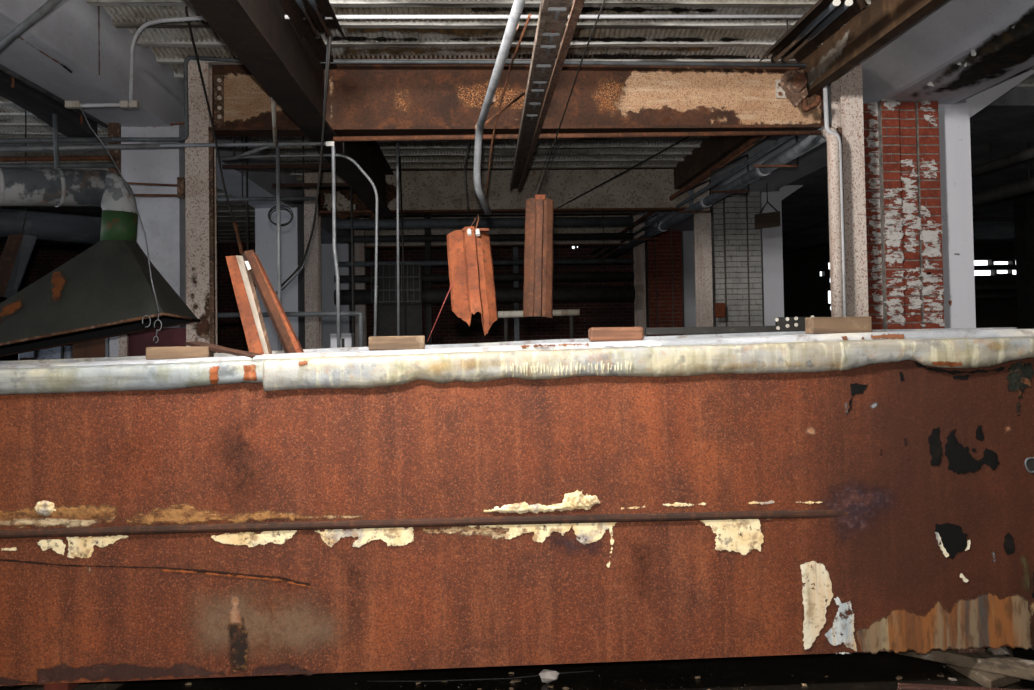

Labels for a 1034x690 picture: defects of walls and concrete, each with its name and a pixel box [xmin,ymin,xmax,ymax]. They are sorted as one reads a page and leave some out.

rust [456,81,526,109]
peeling [614,30,849,125]
peeling [862,98,960,340]
rust [0,234,24,317]
rust [209,366,219,385]
rust [243,365,257,381]
crack [0,559,310,586]
rust [228,597,249,673]
leakage [203,605,328,644]
peeling [0,490,616,571]
peeling [700,519,764,555]
peeling [800,561,857,654]